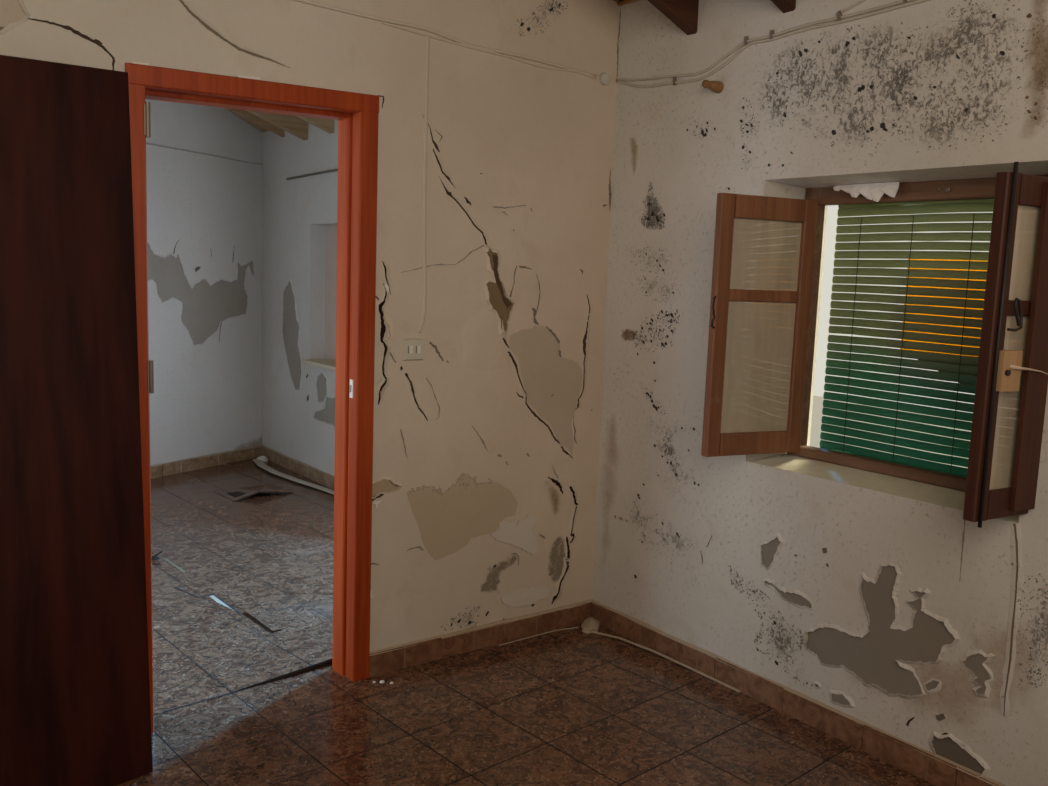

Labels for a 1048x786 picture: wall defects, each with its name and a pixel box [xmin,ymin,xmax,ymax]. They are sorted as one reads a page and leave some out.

crack [28,18,115,70]
water stain [740,0,1048,169]
mould [641,182,665,230]
flaking render [147,238,255,346]
flaking render [282,279,335,427]
crack [374,113,532,456]
flaking render [483,244,515,338]
water stain [622,246,680,364]
crack [472,266,594,605]
mould [728,565,813,687]
flaking render [804,562,996,699]
crack [999,523,1025,718]